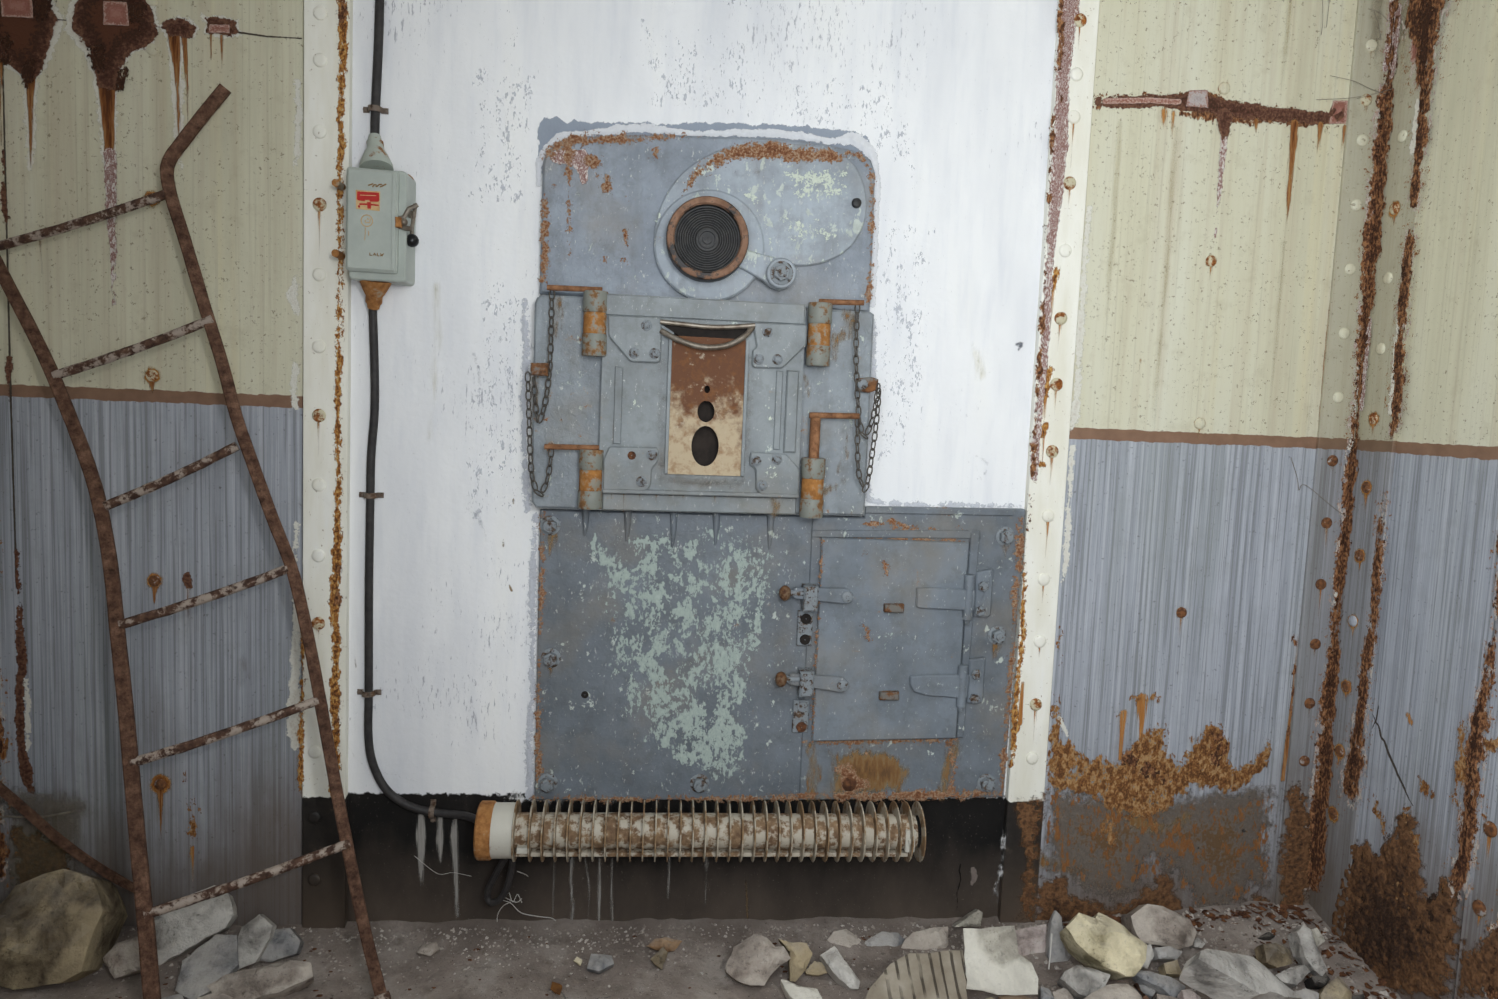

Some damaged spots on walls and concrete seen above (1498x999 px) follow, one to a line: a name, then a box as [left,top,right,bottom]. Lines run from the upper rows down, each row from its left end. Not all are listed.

corrosion [0,64,11,271]
corrosion [144,368,160,392]
corrosion [296,0,356,791]
corrosion [0,299,35,888]
corrosion [182,572,193,599]
corrosion [529,0,1498,999]
corrosion [150,771,186,839]
corrosion [186,798,202,868]